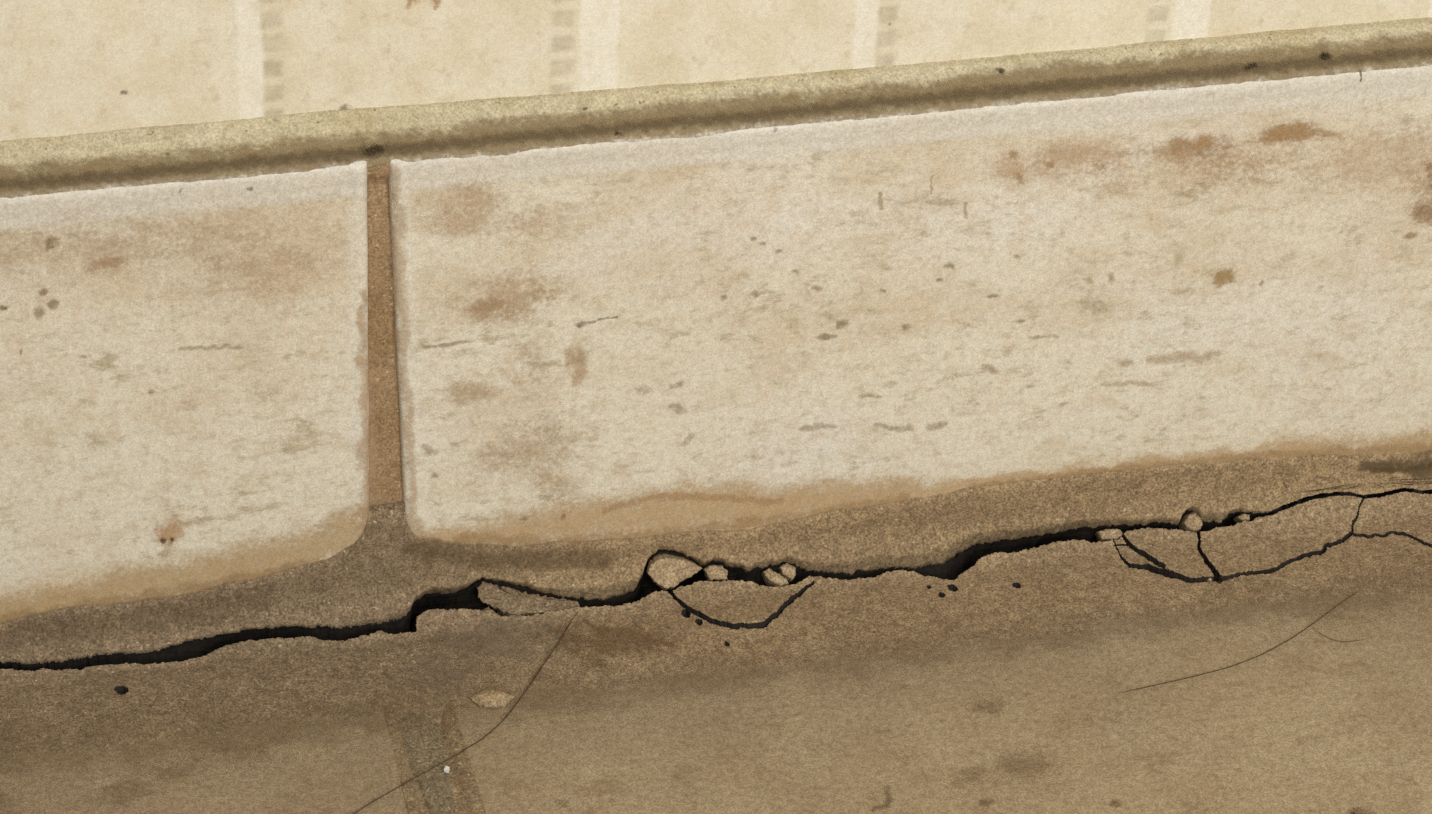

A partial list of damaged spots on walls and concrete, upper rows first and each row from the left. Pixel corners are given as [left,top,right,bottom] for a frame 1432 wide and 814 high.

damp [0,509,367,623]
damp [413,474,972,547]
crack [0,488,1432,671]
damp [1005,428,1432,482]